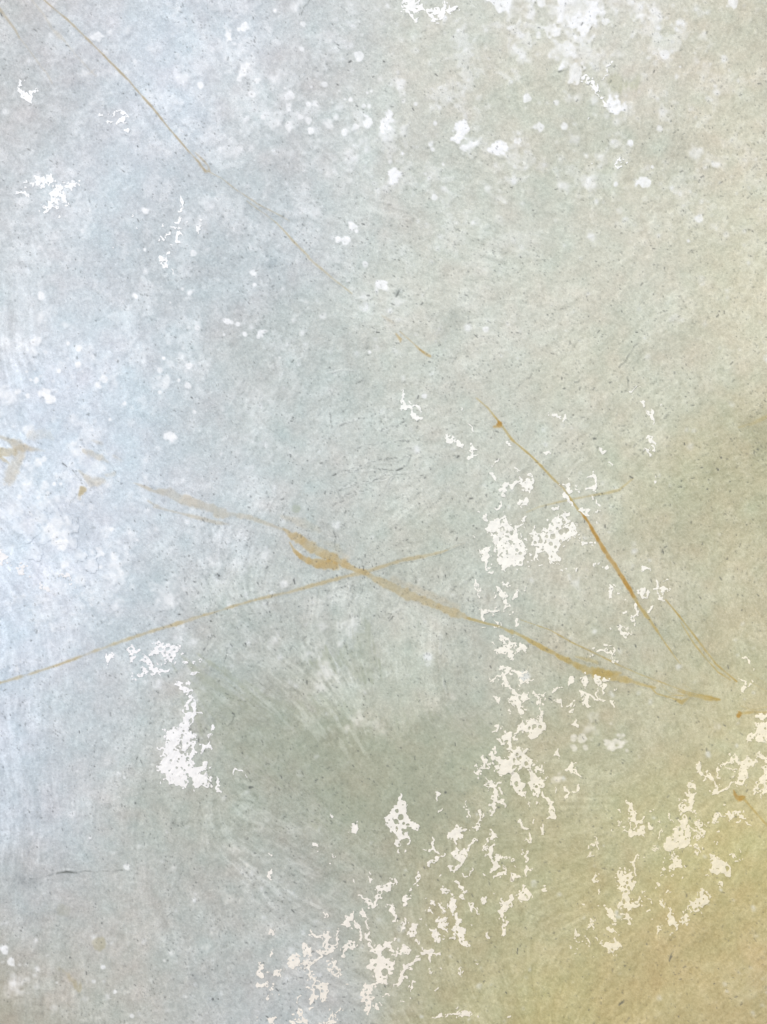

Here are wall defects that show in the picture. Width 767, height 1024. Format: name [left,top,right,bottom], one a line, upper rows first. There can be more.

peeling [444,424,477,460]
peeling [105,641,222,793]
peeling [256,458,617,1024]
peeling [570,713,767,958]